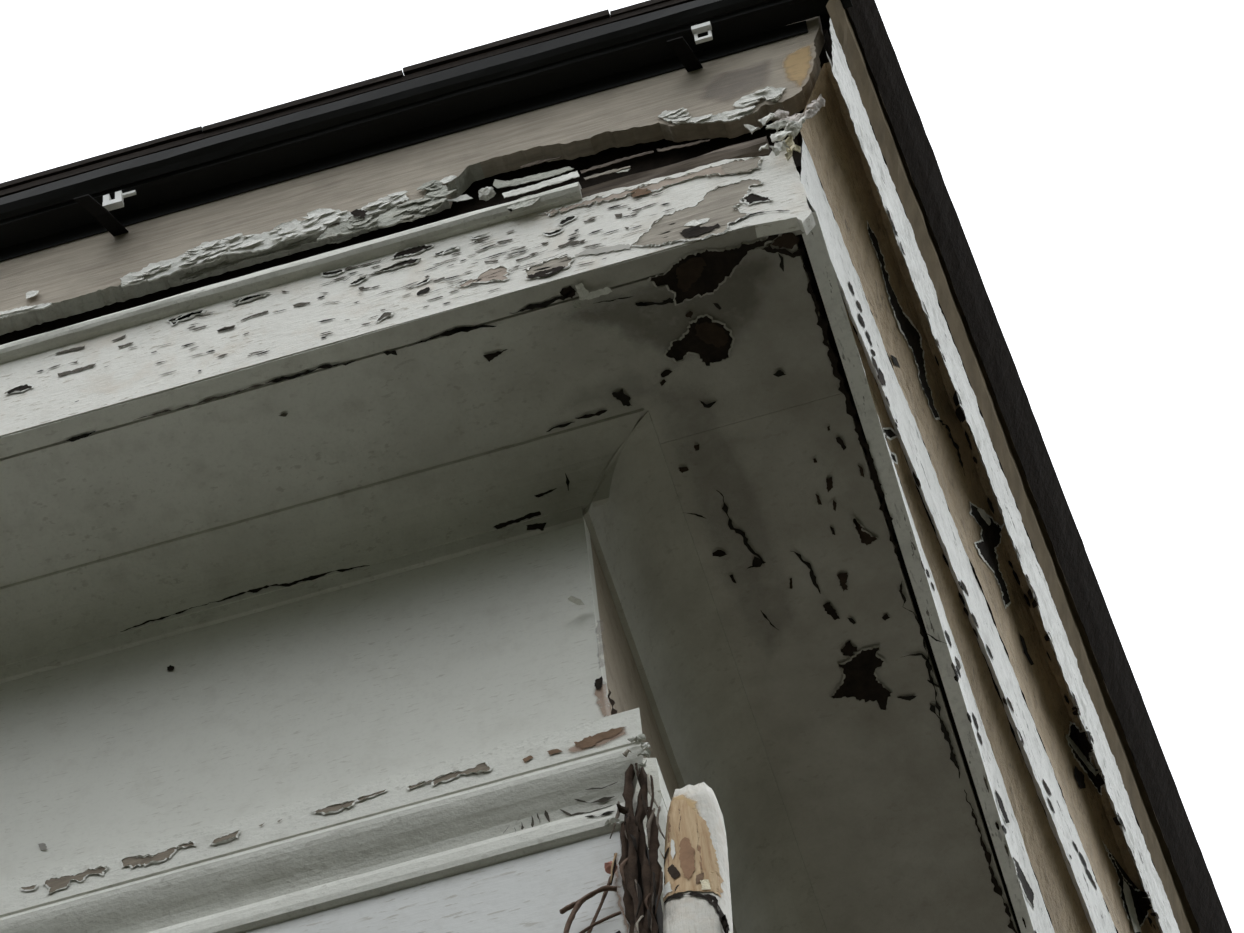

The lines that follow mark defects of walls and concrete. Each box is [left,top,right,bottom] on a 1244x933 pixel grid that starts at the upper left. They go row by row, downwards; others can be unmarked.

peeling [37,346,107,377]
peeling [120,86,825,375]